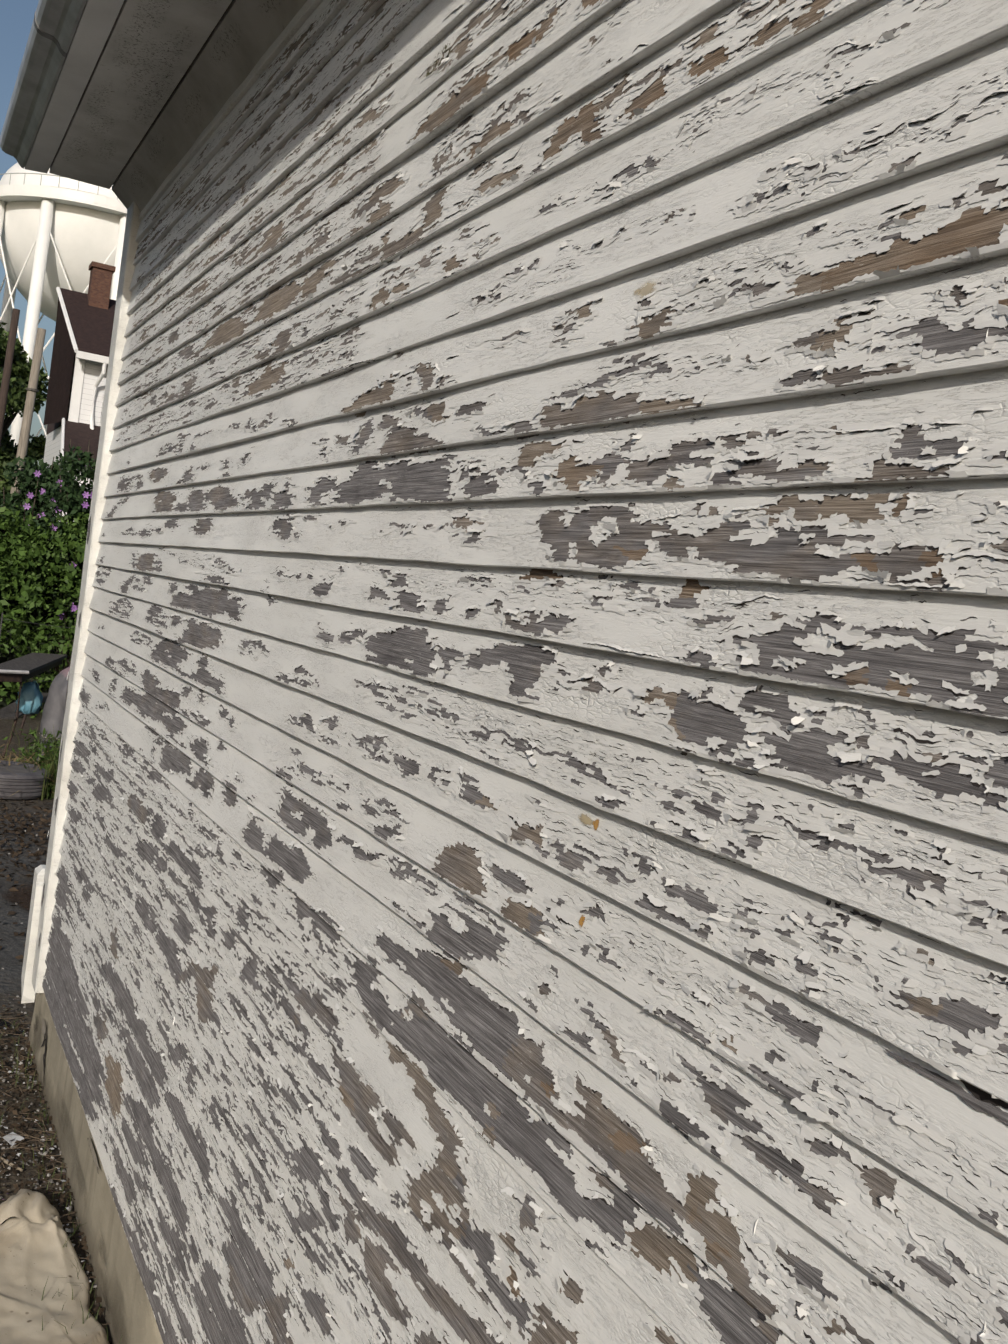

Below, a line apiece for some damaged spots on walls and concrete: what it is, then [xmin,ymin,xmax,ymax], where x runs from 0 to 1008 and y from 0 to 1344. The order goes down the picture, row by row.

peeling [94,0,1008,814]
peeling [38,556,1008,1344]
crack [350,675,1008,1202]